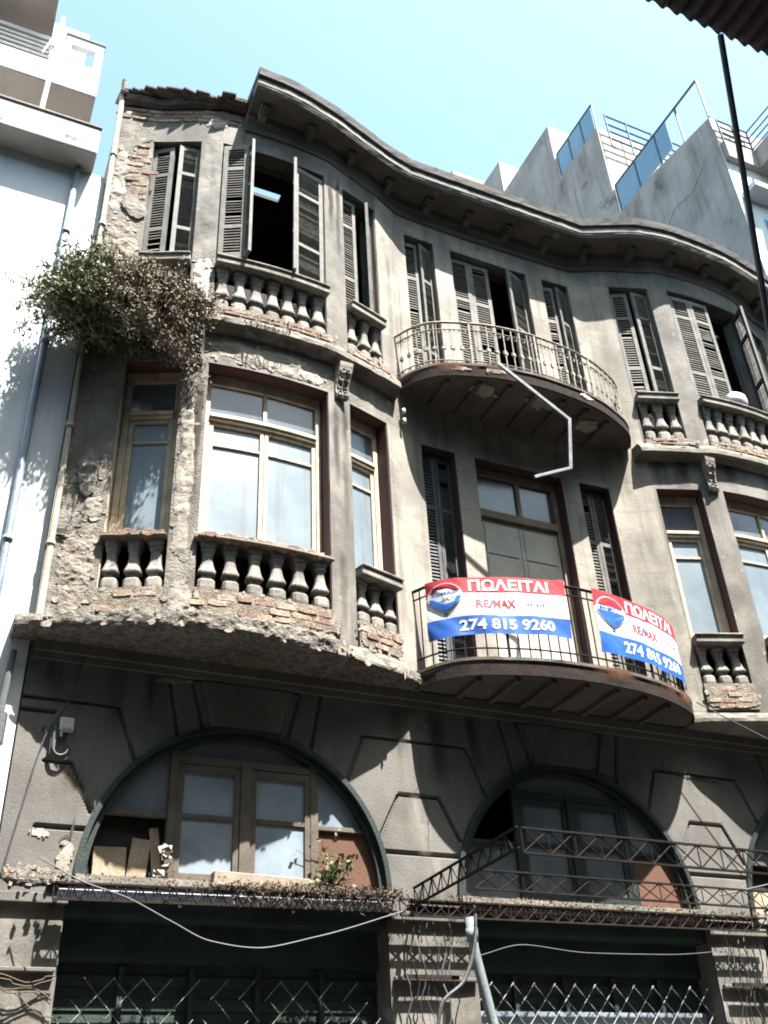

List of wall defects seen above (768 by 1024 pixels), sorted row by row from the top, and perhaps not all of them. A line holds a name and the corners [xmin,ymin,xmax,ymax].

flaking render [102,144,159,266]
flaking render [192,258,394,375]
flaking render [652,435,701,446]
flaking render [717,439,768,459]
flaking render [41,386,409,679]
flaking render [704,683,761,708]
flaking render [0,840,74,886]